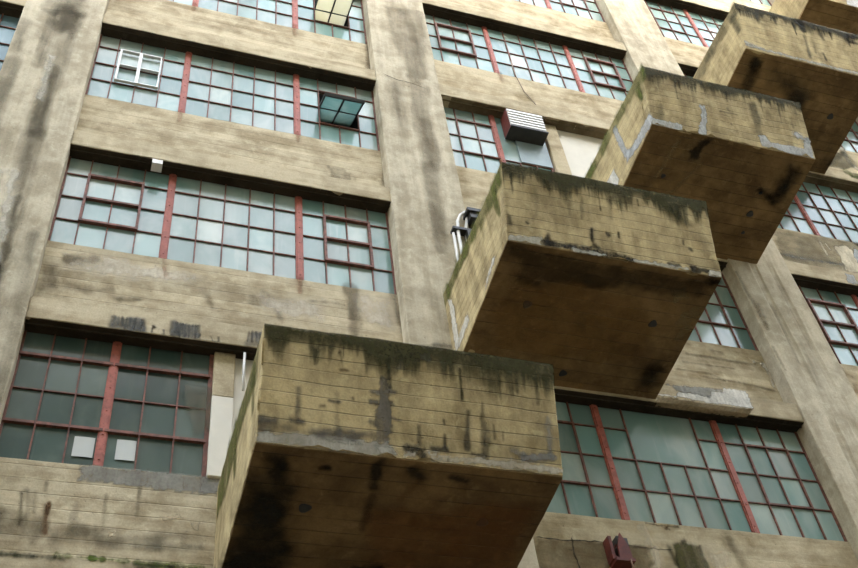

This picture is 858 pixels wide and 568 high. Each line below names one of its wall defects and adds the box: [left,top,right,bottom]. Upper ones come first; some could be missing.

leakage [403,435,449,458]
leakage [464,411,495,458]